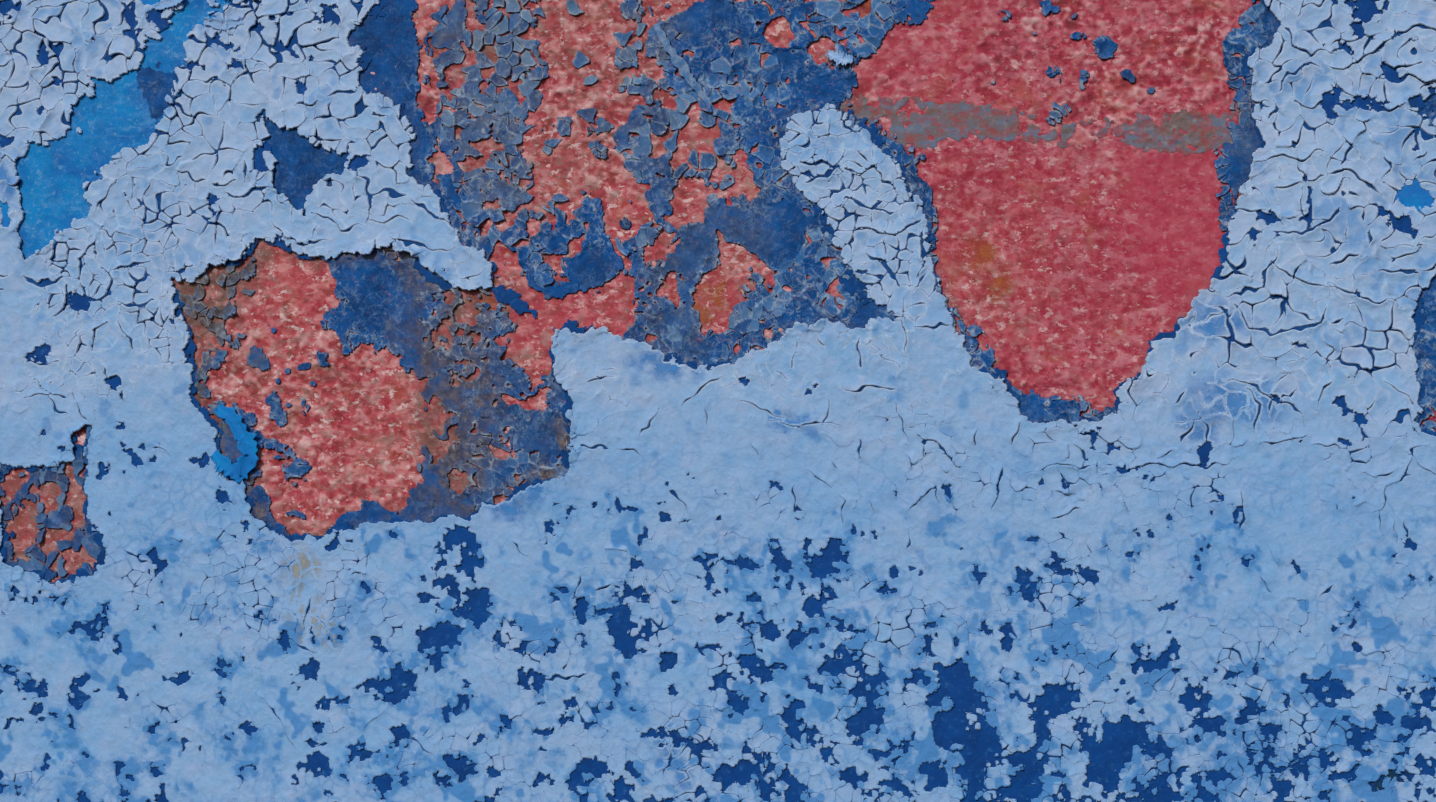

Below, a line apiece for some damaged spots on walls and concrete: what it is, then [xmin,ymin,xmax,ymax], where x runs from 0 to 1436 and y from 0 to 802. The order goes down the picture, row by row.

crack [0,243,154,379]
peeling [0,410,158,615]
peeling [0,0,314,284]
crack [276,170,451,251]
peeling [159,0,1299,802]
crack [801,139,947,344]
crack [1232,139,1426,449]
crack [1269,0,1436,118]
crack [1379,388,1429,535]
peeling [1376,178,1436,455]
spalling [0,664,100,730]
spalling [533,524,1436,802]